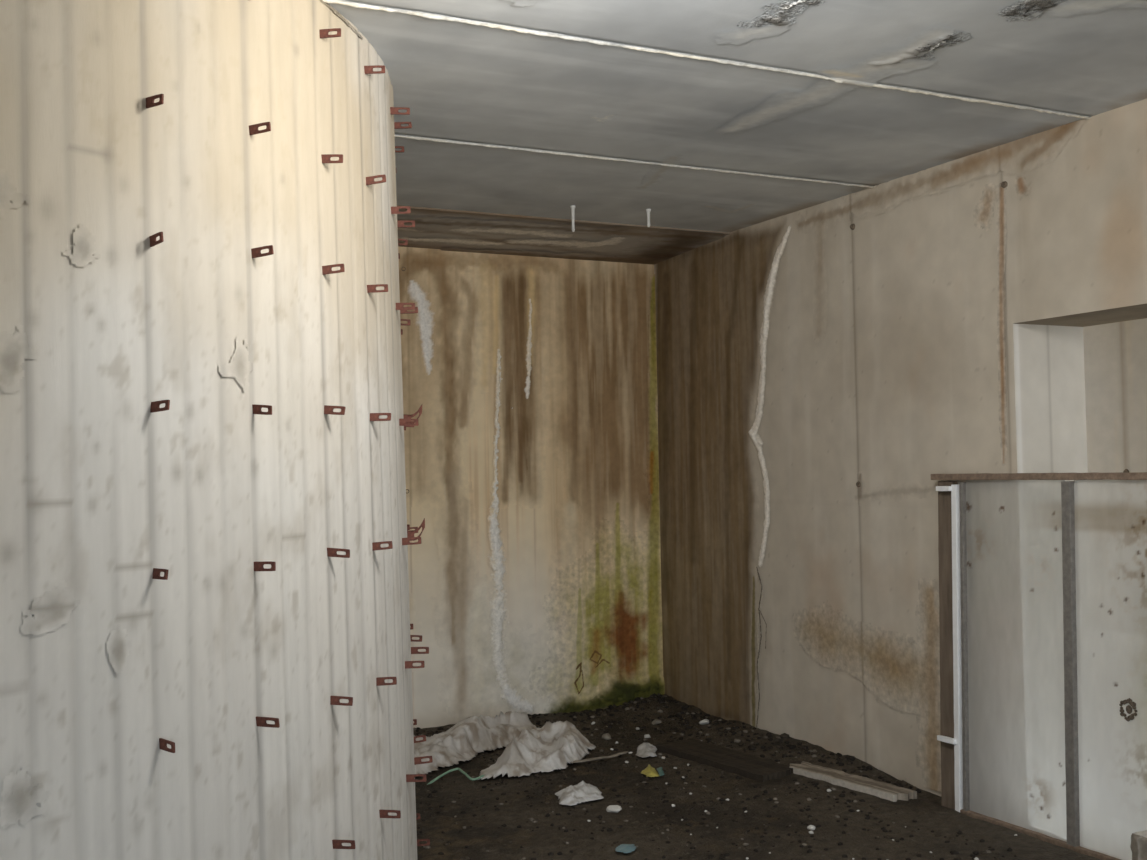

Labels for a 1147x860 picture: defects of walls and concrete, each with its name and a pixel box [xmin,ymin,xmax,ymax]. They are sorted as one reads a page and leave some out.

corrosion [587,584,654,679]
water stain [397,119,1087,727]